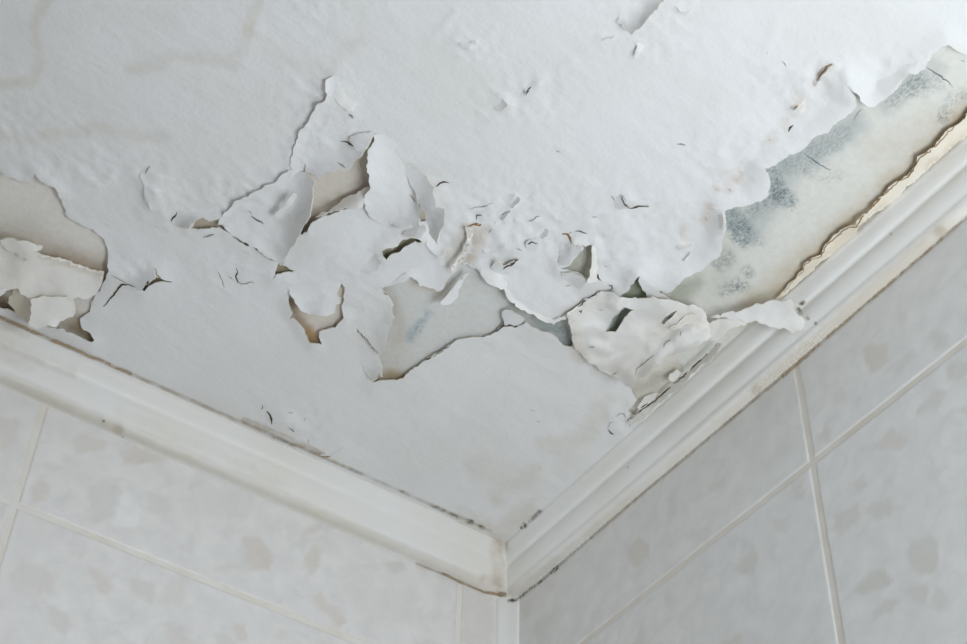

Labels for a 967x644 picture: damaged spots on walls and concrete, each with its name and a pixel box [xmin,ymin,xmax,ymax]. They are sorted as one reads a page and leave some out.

peeling [600,0,664,57]
peeling [0,171,171,342]
peeling [172,45,967,426]
water stain [782,310,859,377]